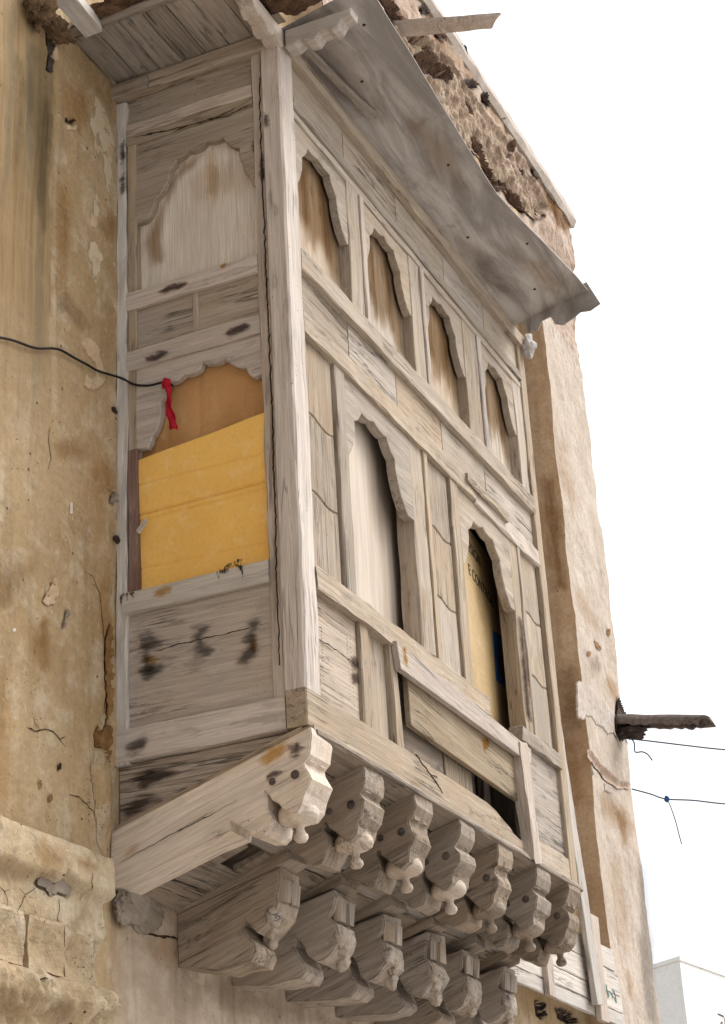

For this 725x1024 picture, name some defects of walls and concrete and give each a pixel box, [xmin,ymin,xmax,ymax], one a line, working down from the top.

peeling [65,95,126,284]
crack [27,720,64,743]
spalling [92,624,115,765]
peeling [575,681,626,742]
spalling [587,749,631,794]